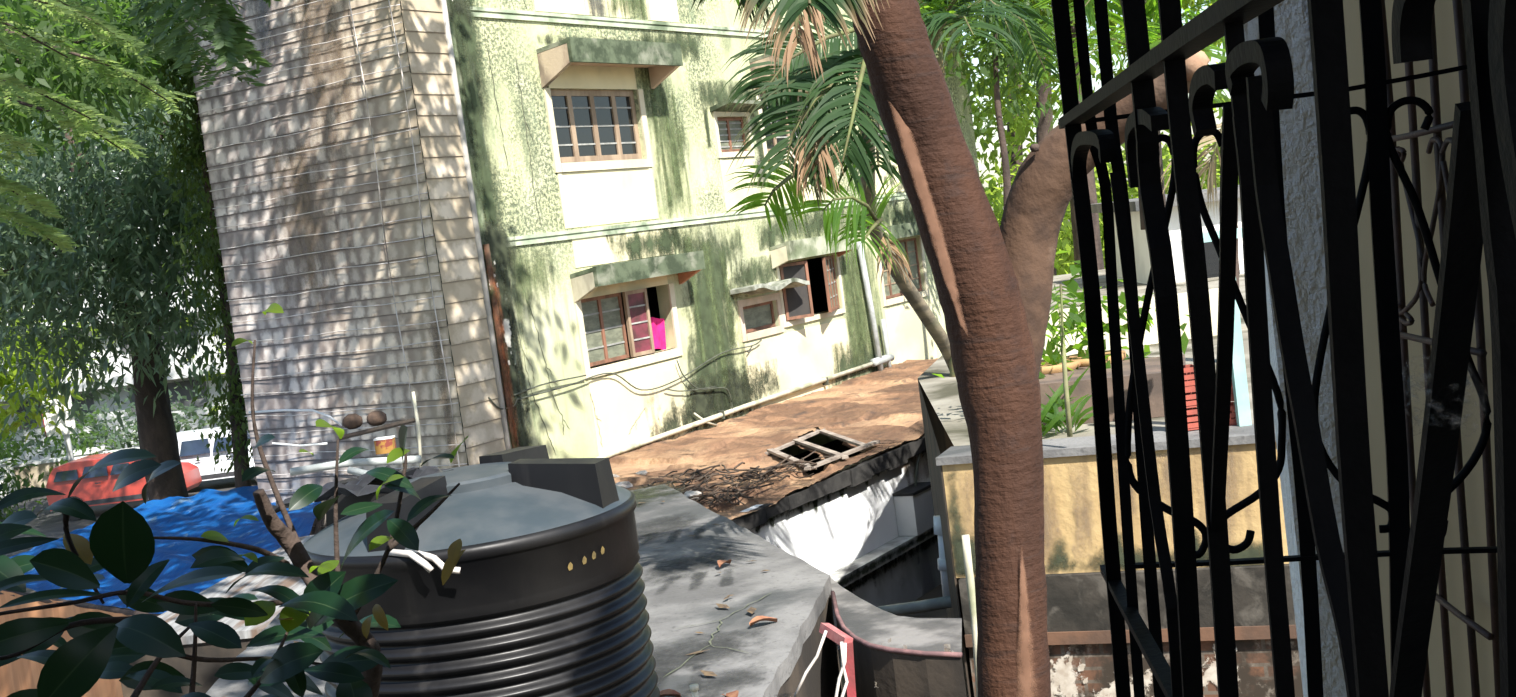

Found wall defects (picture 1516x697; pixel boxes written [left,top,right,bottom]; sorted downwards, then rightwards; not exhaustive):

damp [590,0,701,59]
damp [447,0,485,201]
damp [647,68,684,205]
damp [629,236,640,259]
corrosion [491,268,518,445]
damp [480,220,532,447]
damp [652,207,861,440]
peeling [1050,651,1153,697]
peeling [1202,644,1218,697]